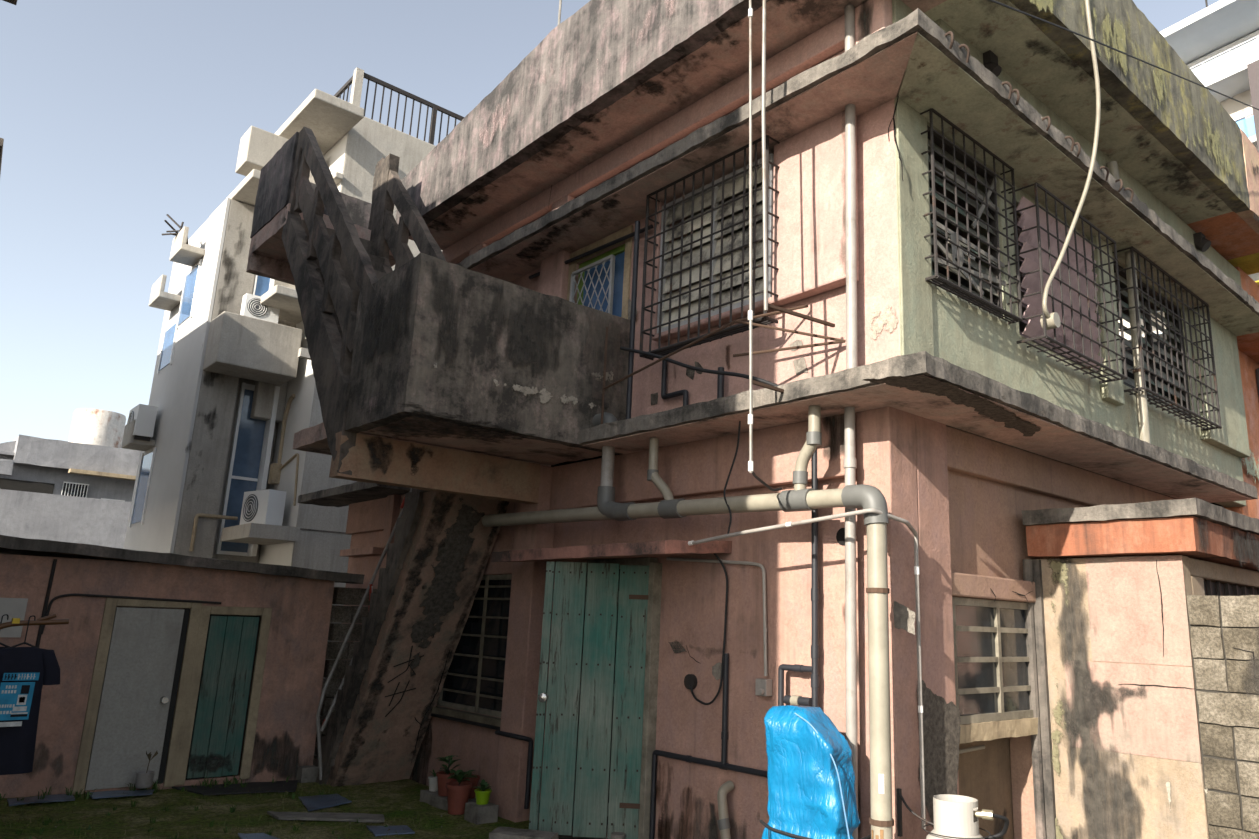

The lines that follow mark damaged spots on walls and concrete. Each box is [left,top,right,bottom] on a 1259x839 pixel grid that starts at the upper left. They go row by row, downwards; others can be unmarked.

damp [636,18,741,96]
damp [859,0,872,41]
damp [1140,141,1223,211]
damp [433,263,458,364]
damp [490,284,560,374]
peeling [492,377,600,409]
spalling [863,376,1047,436]
damp [338,495,454,787]
damp [405,501,509,785]
crack [1118,560,1193,689]
damp [1048,557,1142,839]
spalling [917,680,961,828]